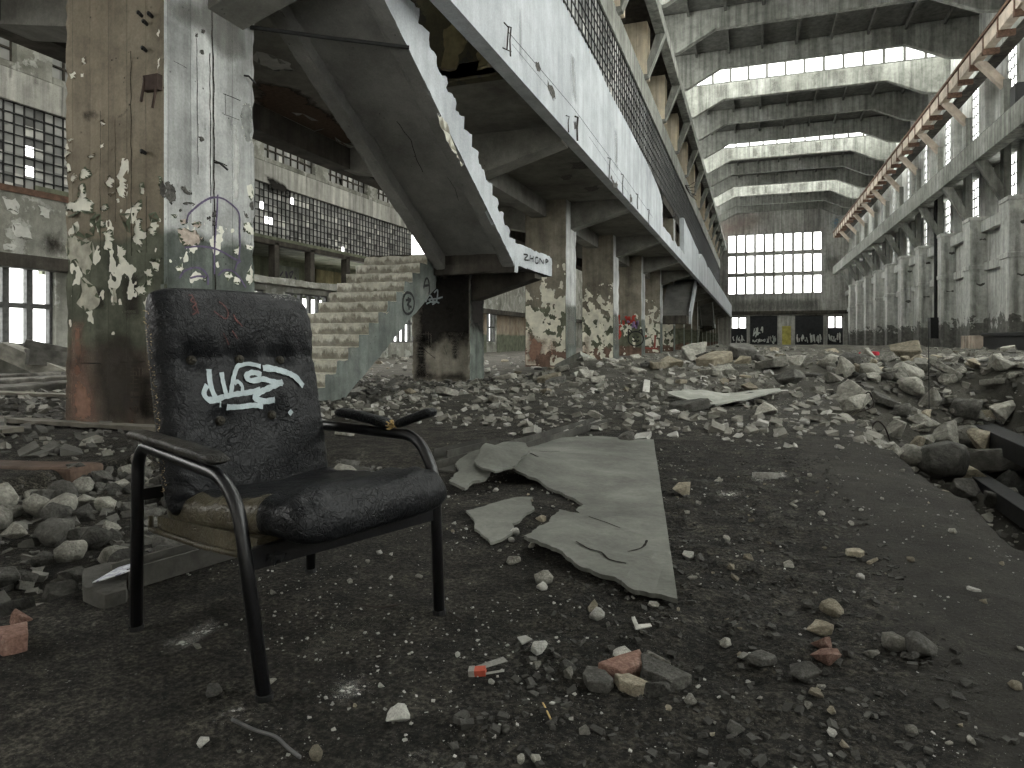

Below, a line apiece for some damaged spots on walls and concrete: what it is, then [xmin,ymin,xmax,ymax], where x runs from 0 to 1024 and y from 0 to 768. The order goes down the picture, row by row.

peeling [2,196,32,252]
peeling [38,205,51,218]
peeling [65,137,254,324]
corrosion [71,326,92,422]
damp [416,337,465,380]
peeling [526,263,565,366]
peeling [582,283,673,359]